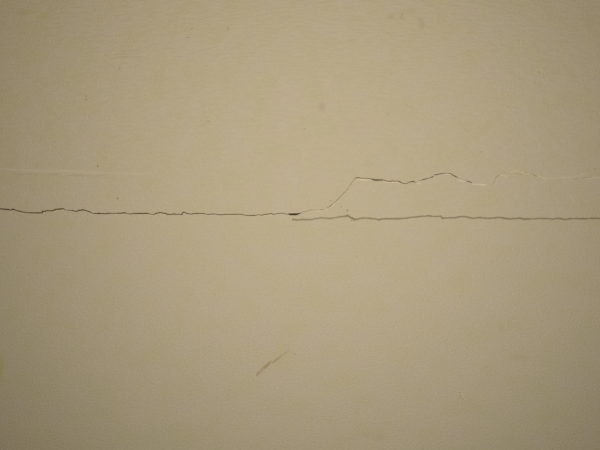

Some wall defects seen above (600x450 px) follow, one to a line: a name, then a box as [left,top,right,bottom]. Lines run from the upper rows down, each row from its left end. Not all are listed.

crack [0,173,600,222]